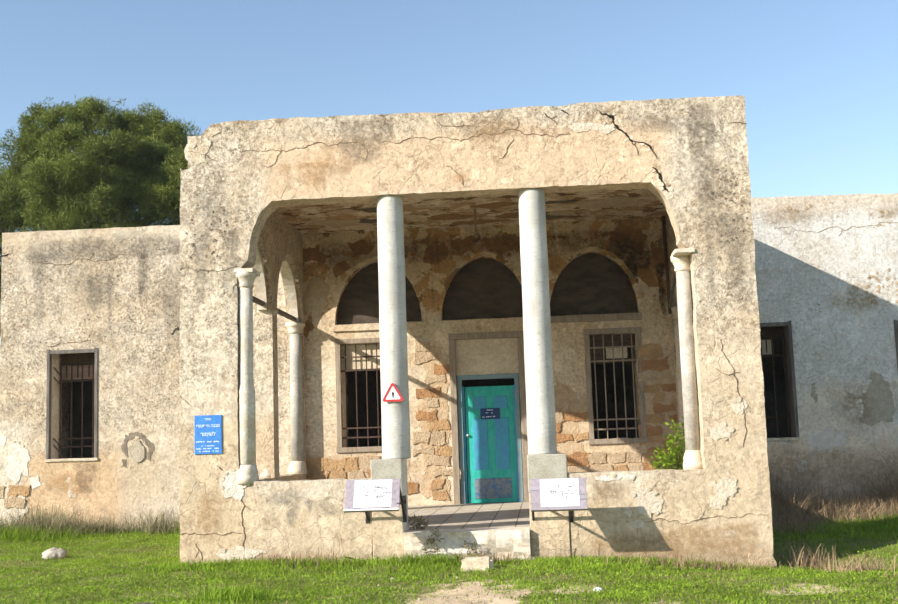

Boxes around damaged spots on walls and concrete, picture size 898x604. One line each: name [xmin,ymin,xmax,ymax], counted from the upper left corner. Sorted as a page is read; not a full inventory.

crack [238,110,569,167]
crack [597,110,673,192]
peeling [353,207,377,224]
peeling [423,202,520,266]
peeling [545,200,580,220]
crack [715,343,750,443]
peeling [847,370,895,426]
peeling [554,341,679,528]
peeling [0,435,42,523]
peeling [219,469,250,501]